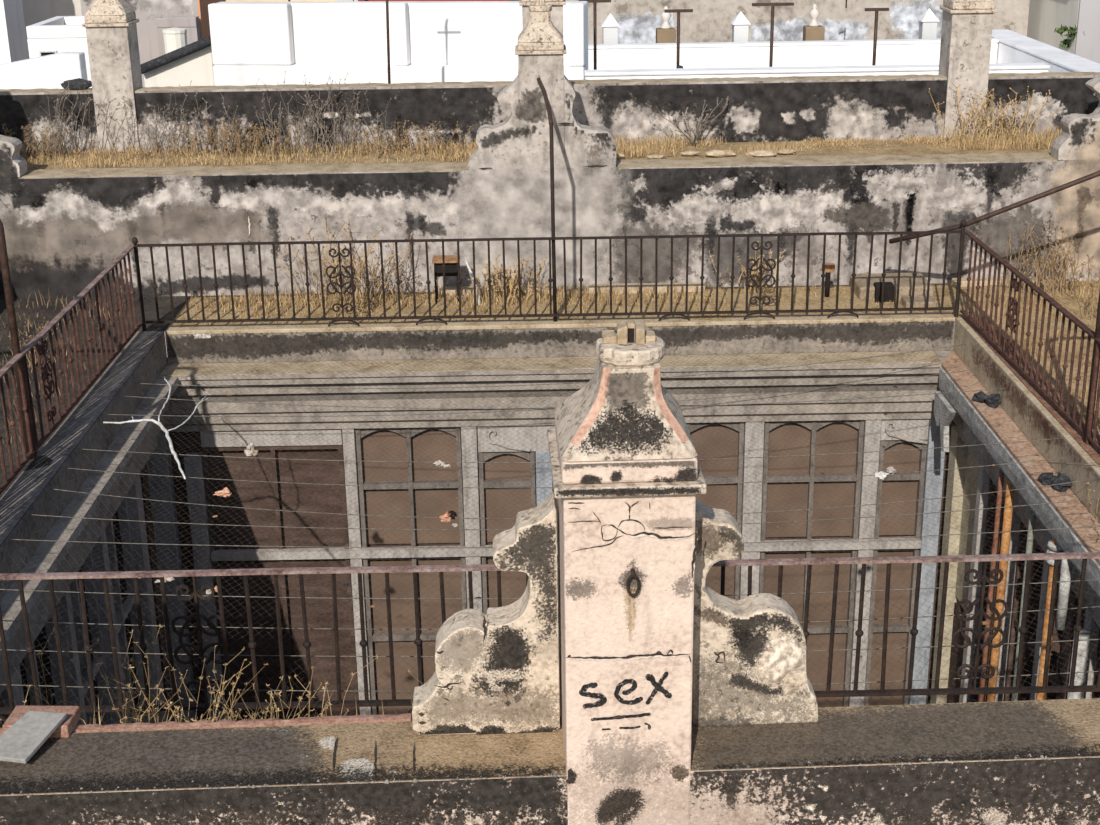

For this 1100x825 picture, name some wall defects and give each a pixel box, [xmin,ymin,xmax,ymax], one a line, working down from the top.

peeling [890,0,943,39]
damp [565,78,1100,284]
damp [556,372,700,497]
crack [568,501,700,581]
damp [470,521,557,706]
damp [694,606,806,696]
damp [0,726,577,825]
damp [671,700,1100,825]